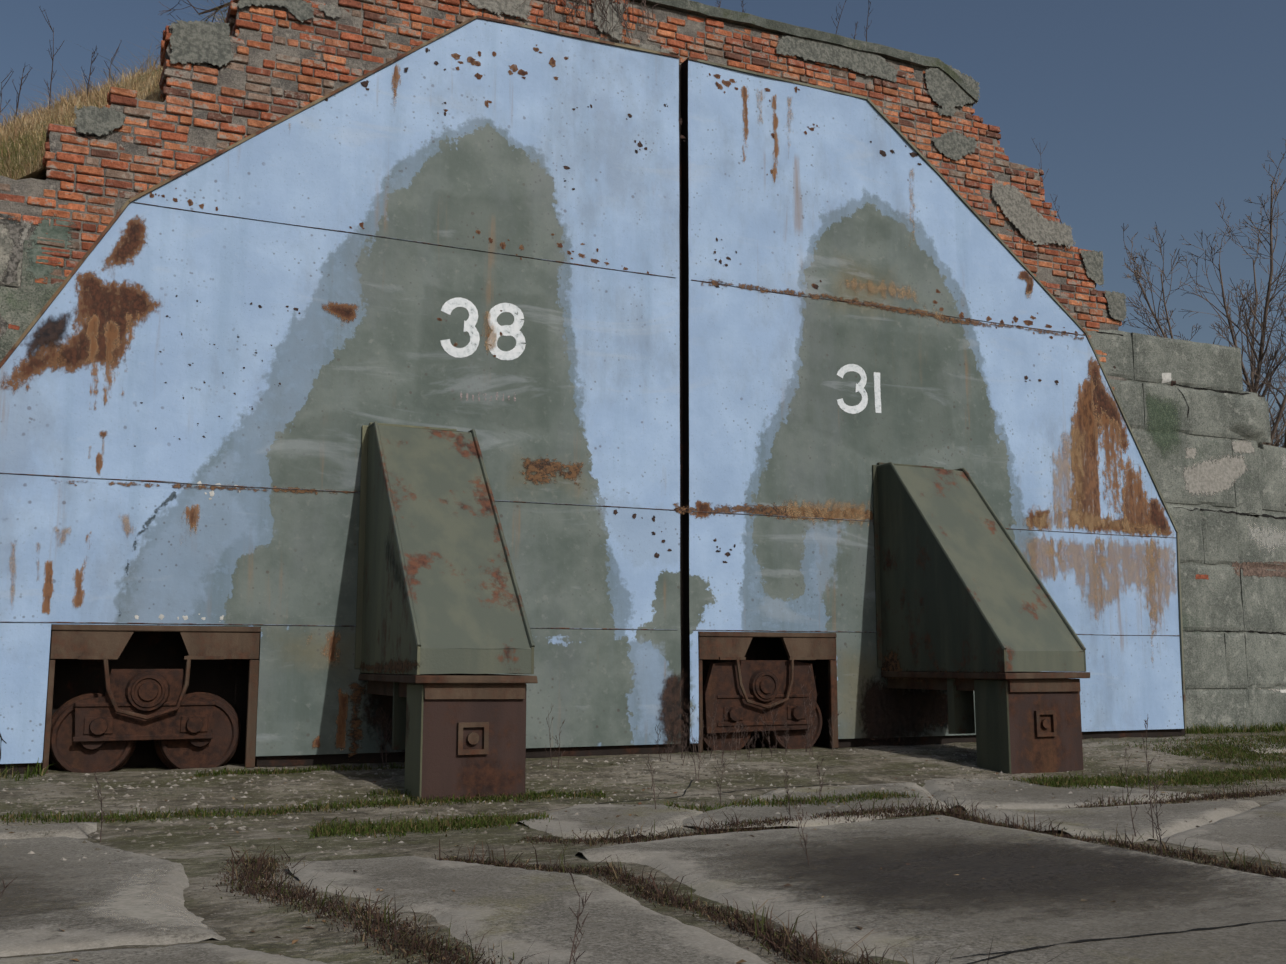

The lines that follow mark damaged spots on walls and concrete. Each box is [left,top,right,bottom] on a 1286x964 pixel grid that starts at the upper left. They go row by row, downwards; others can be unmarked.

peeling [237,0,347,22]
peeling [169,20,234,70]
peeling [709,73,738,93]
peeling [776,35,898,82]
corrosion [741,86,791,182]
peeling [870,64,980,166]
peeling [992,182,1127,321]
corrosion [1,215,160,404]
corrosion [702,279,1084,340]
corrosion [673,501,873,523]
corrosion [1026,358,1175,623]
corrosion [42,561,53,614]